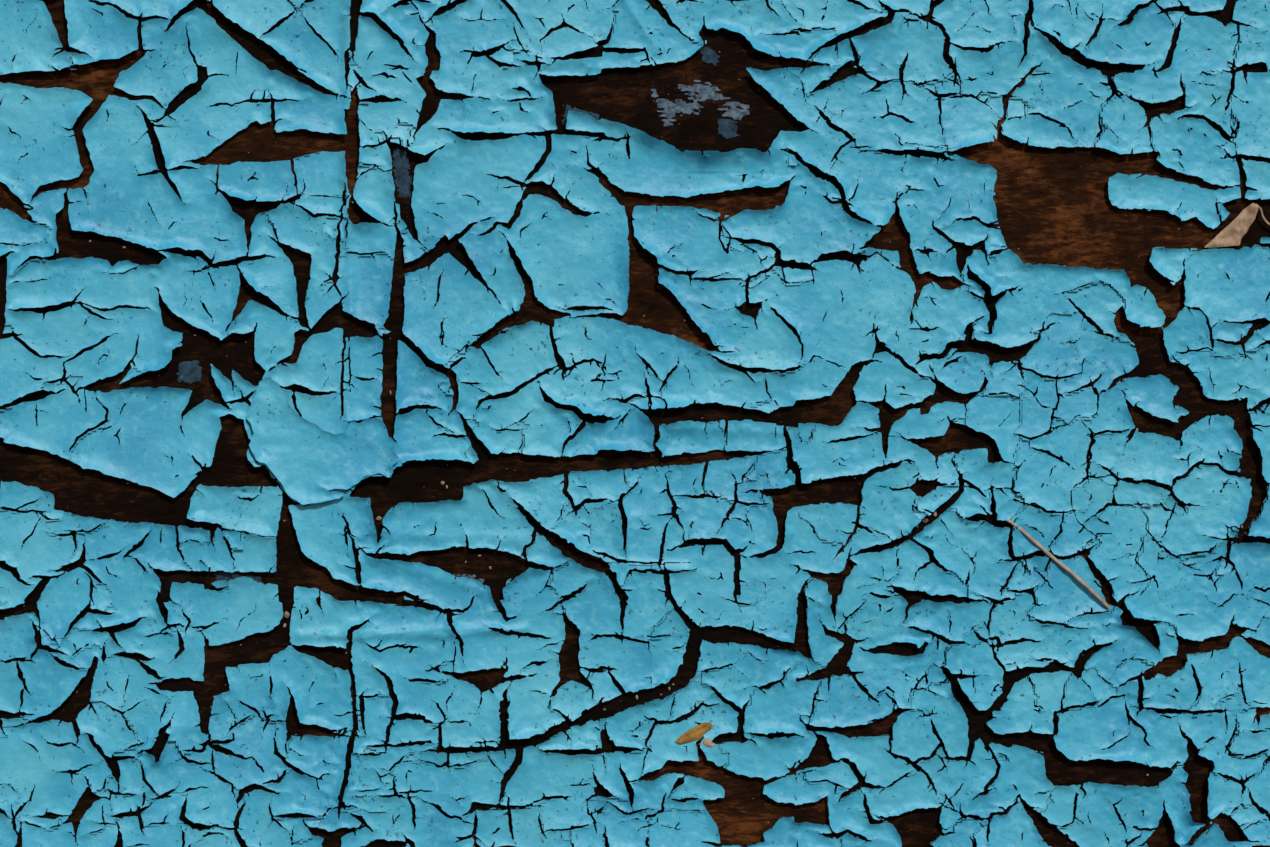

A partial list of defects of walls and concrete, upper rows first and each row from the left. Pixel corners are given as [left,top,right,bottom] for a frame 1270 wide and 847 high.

crack [0,12,75,163]
peeling [0,0,449,758]
peeling [99,0,1270,680]
peeling [419,657,537,748]
peeling [499,806,606,847]
peeling [547,604,598,722]
crack [0,237,1270,847]
peeling [596,546,1270,847]